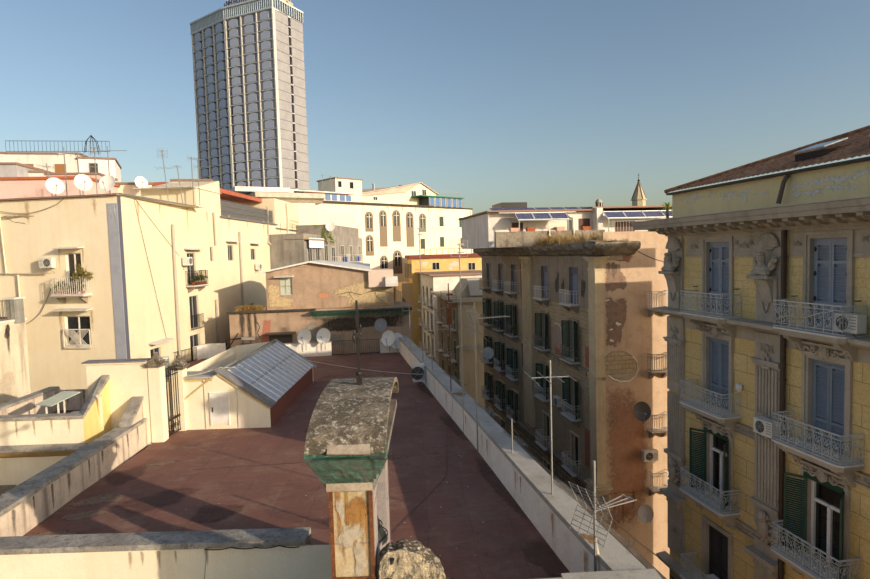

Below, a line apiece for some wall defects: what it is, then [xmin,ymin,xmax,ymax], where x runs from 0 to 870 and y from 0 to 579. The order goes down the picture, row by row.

flaking render [605,263,639,383]
water stain [117,488,190,513]
water stain [192,505,241,522]
peeling [336,499,366,577]